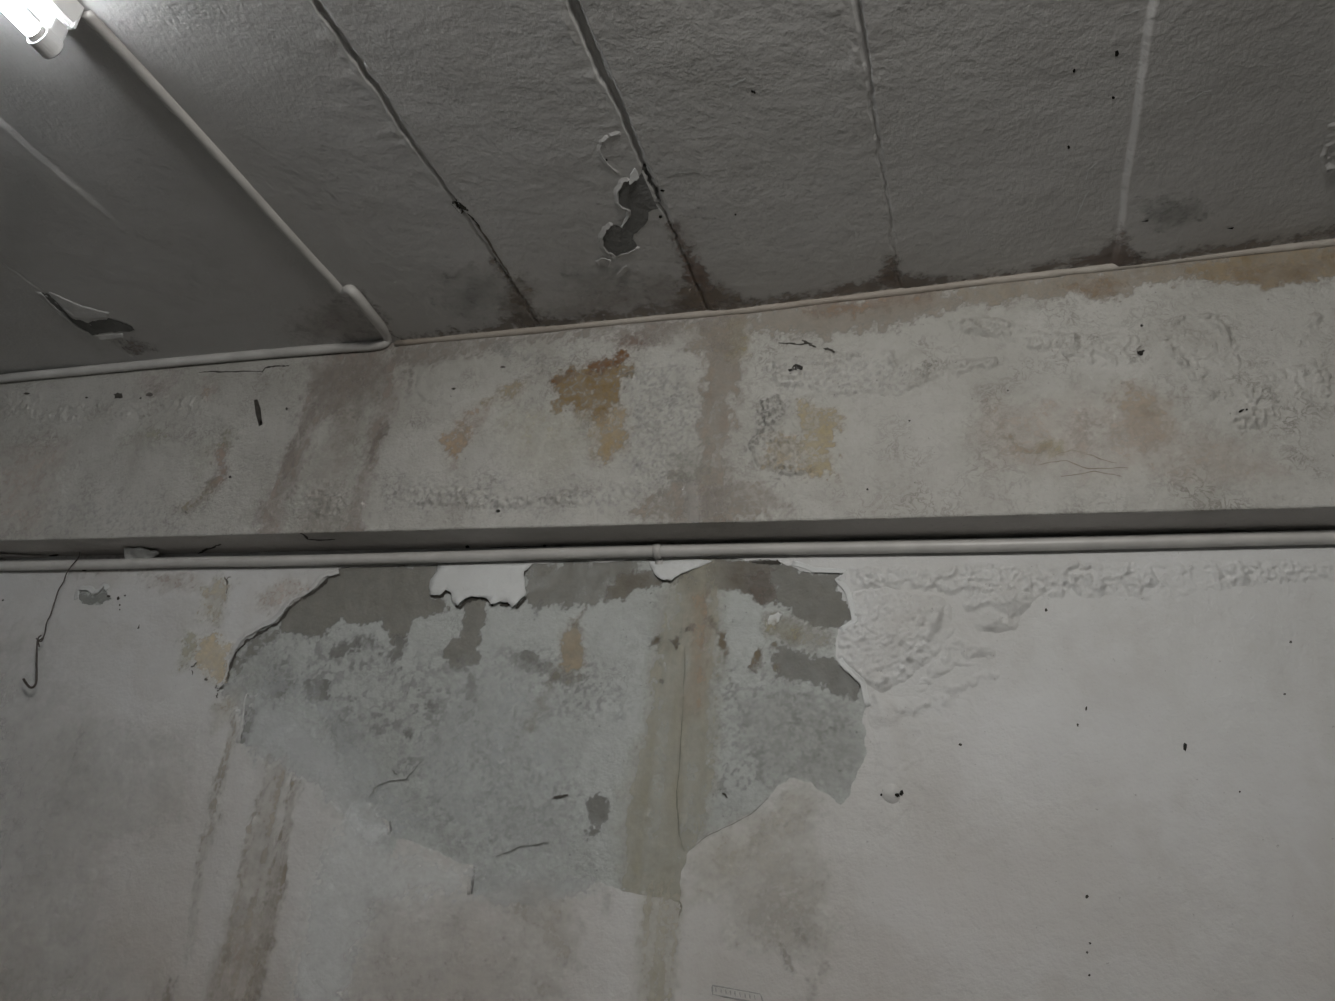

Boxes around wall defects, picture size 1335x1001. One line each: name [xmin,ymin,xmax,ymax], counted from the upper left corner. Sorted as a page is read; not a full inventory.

peeling [36,292,134,341]
peeling [596,132,665,277]
damp [258,227,1335,534]
peeling [215,545,871,906]
damp [623,558,719,1001]